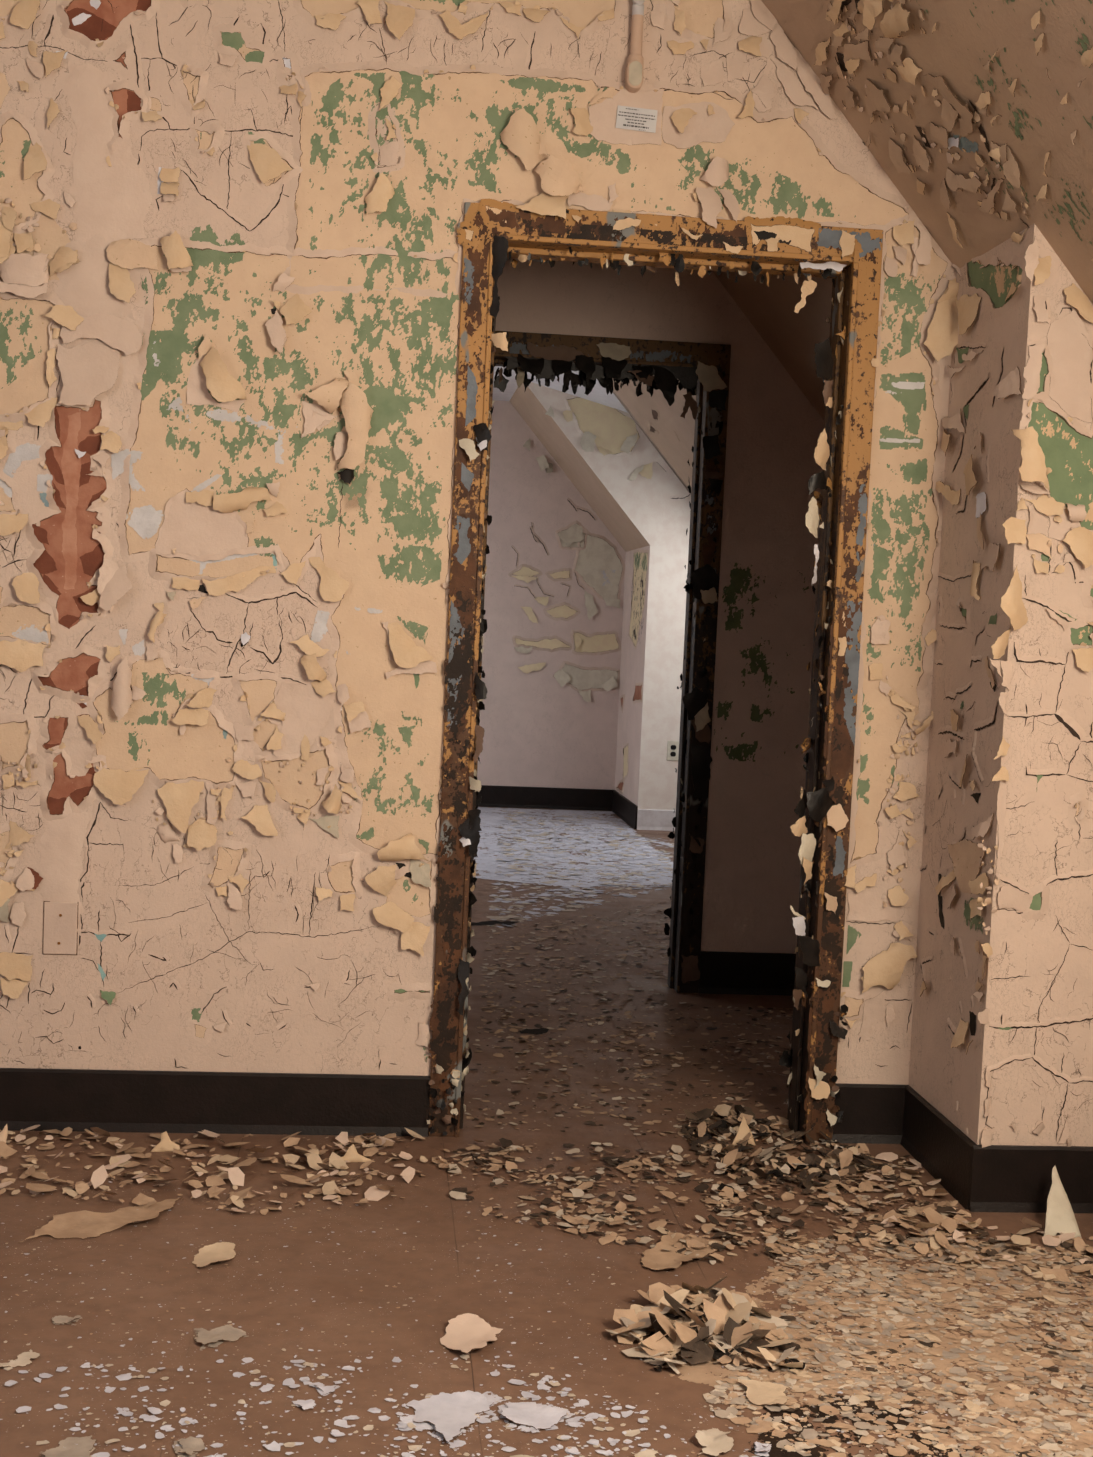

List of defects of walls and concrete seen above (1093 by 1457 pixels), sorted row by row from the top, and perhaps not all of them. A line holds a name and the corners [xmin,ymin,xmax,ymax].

crack [0,0,645,231]
crack [949,298,1093,514]
crack [0,531,27,580]
peeling [0,0,1093,1136]
crack [0,664,53,718]
crack [72,622,96,649]
crack [96,659,123,689]
crack [167,587,320,685]
crack [0,784,43,831]
crack [920,547,1093,1138]
crack [0,800,401,1068]
peeling [965,1069,1045,1148]